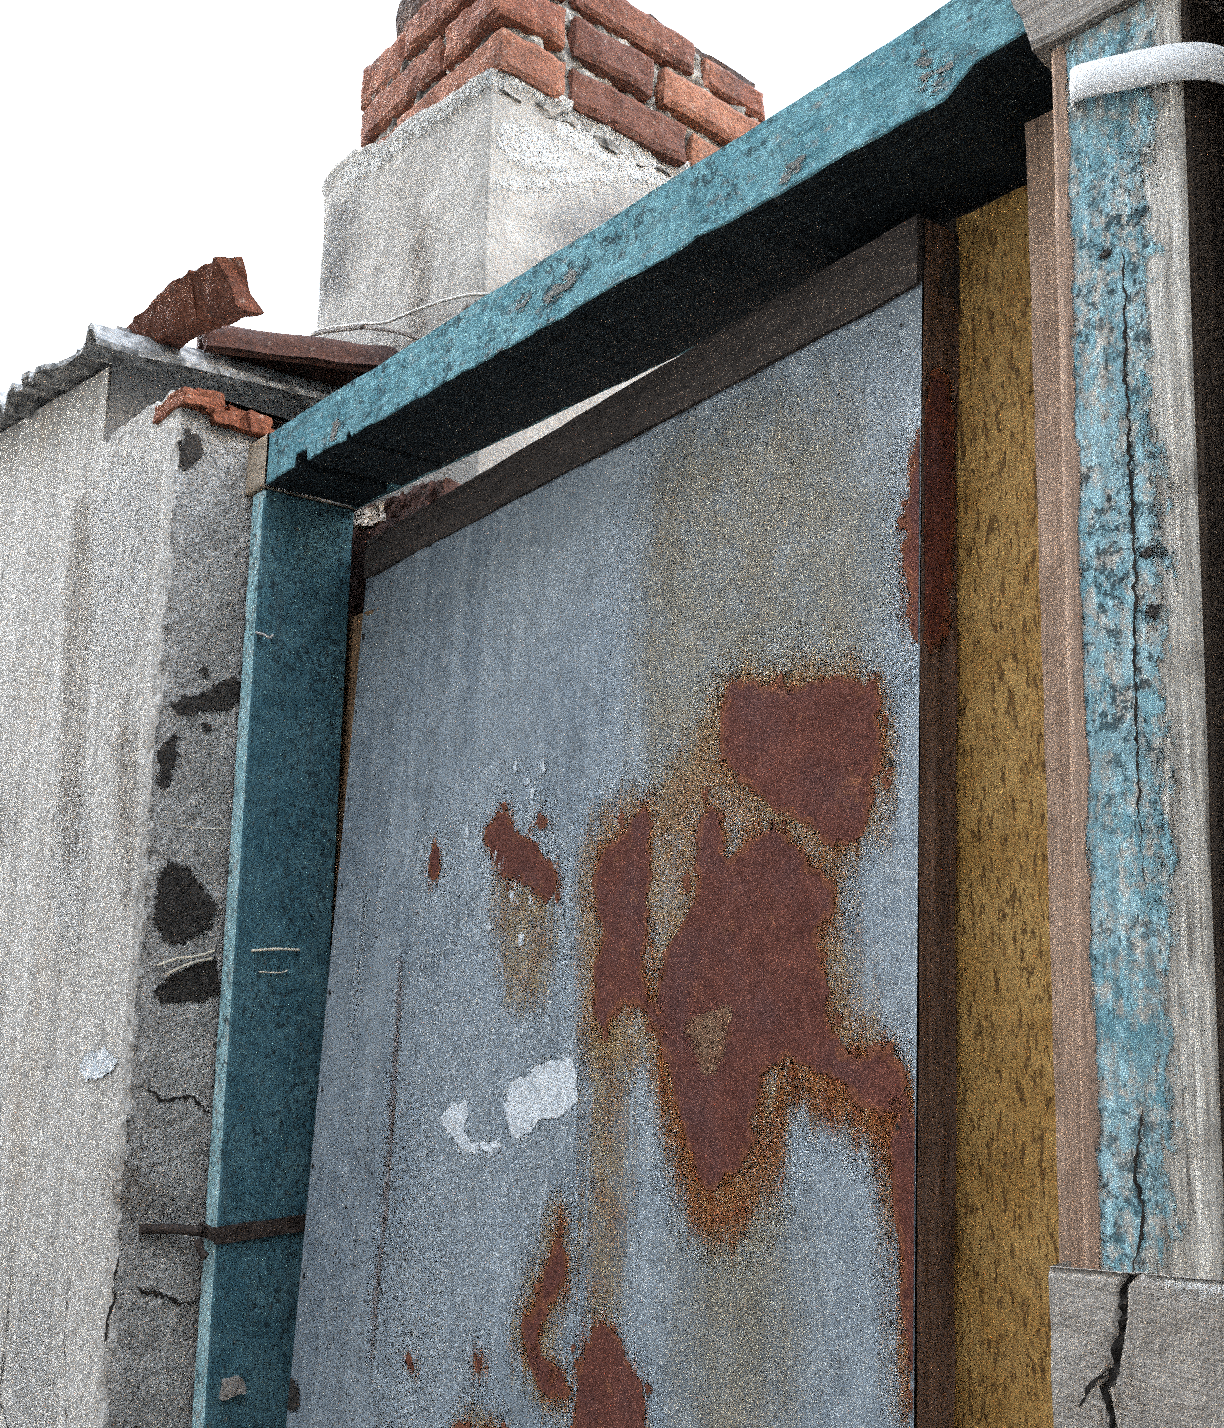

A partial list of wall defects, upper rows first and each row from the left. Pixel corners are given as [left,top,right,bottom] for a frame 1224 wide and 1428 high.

spalling [152,386,277,472]
crack [1121,238,1146,883]
spalling [170,664,241,732]
spalling [156,733,180,790]
spalling [152,860,217,944]
corrosion [483,801,560,904]
spalling [152,960,221,1005]
corrosion [581,670,915,1413]
crack [1079,1108,1145,1428]
corrosion [520,1214,653,1428]